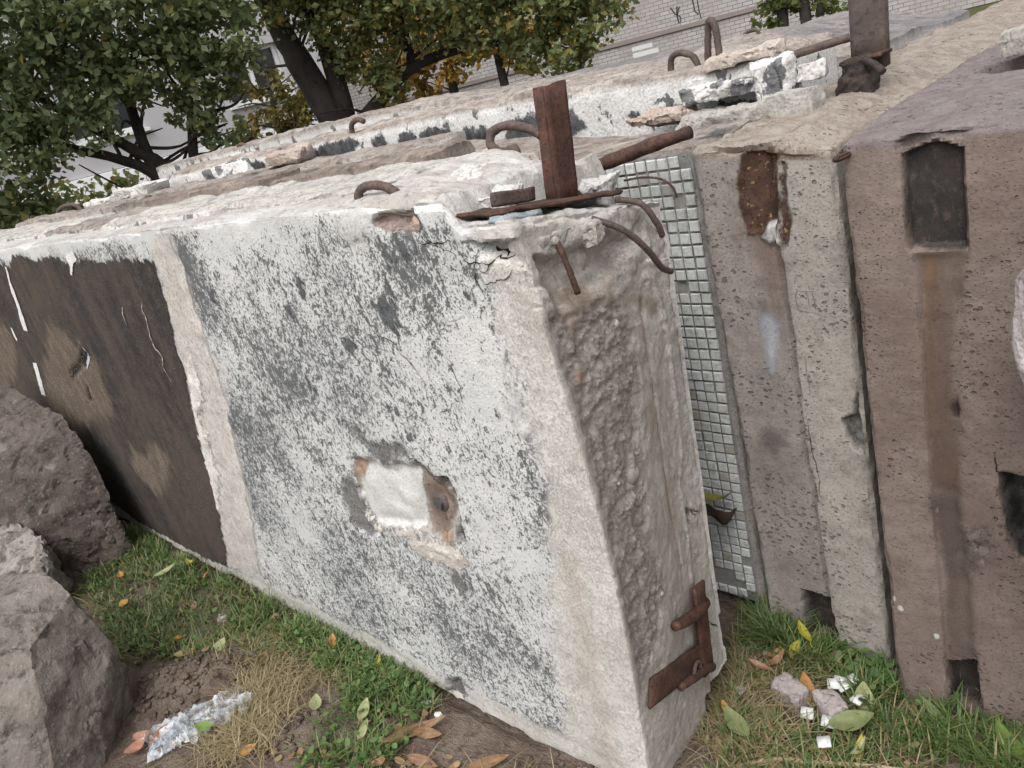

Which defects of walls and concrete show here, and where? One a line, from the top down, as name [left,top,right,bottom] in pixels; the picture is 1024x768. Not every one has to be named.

rust [599,126,694,170]
spalling [614,196,665,238]
peeling [292,276,305,300]
peeling [370,210,425,336]
spalling [555,241,581,295]
spalling [591,215,674,274]
spalling [338,421,469,592]